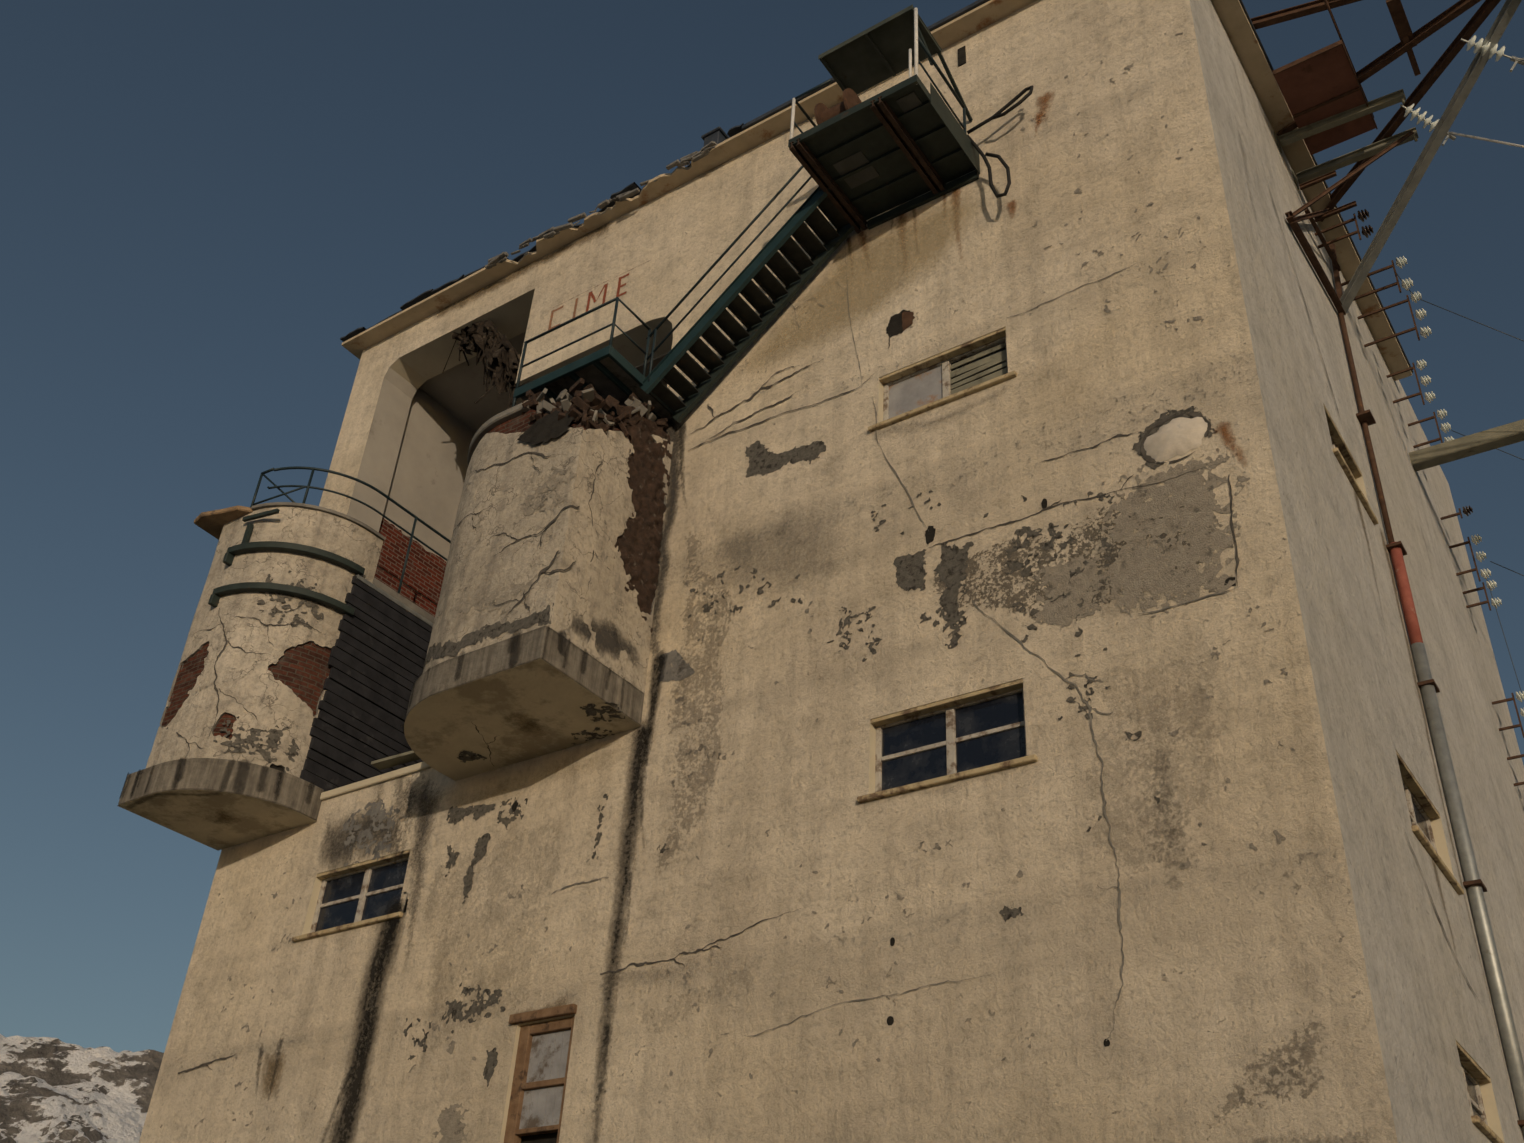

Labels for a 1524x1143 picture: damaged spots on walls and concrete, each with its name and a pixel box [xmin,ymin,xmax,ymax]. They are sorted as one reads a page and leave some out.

spalling [257,570,332,716]
leakage [509,631,521,666]
crack [454,452,610,616]
spalling [611,402,672,633]
peeling [745,440,826,478]
peeling [893,490,974,649]
crack [688,240,1240,614]
peeling [1004,406,1250,720]
leakage [323,784,437,1143]
leakage [559,618,665,1086]
crack [600,908,801,975]
crack [973,600,1124,1041]